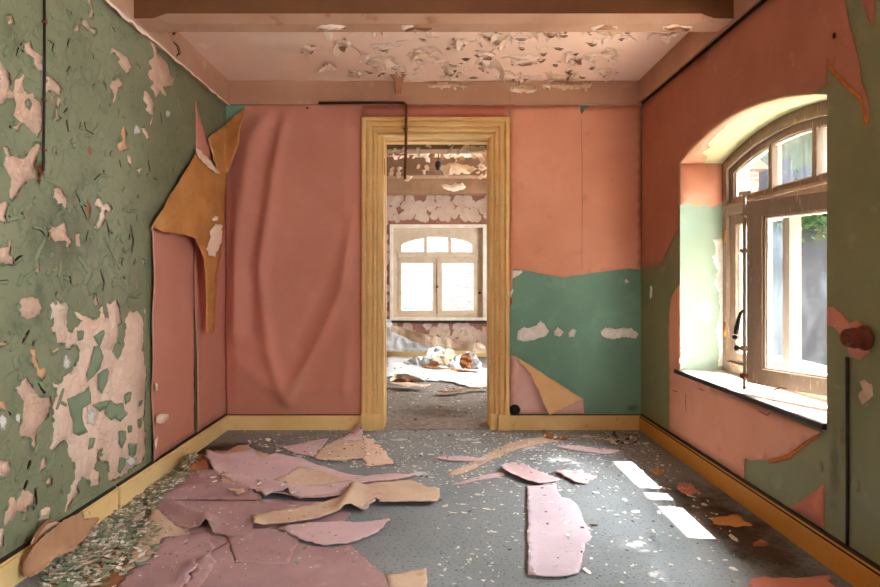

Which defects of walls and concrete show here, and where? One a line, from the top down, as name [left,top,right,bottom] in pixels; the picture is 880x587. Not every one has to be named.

peeling [108,45,132,103]
peeling [141,41,174,141]
peeling [316,24,692,94]
peeling [0,40,63,224]
peeling [47,186,80,252]
peeling [86,195,113,231]
peeling [386,145,487,349]
flaking render [517,320,577,342]
flaking render [599,327,639,339]
peeling [13,293,158,513]
peeling [0,488,51,548]
peeling [39,465,191,587]